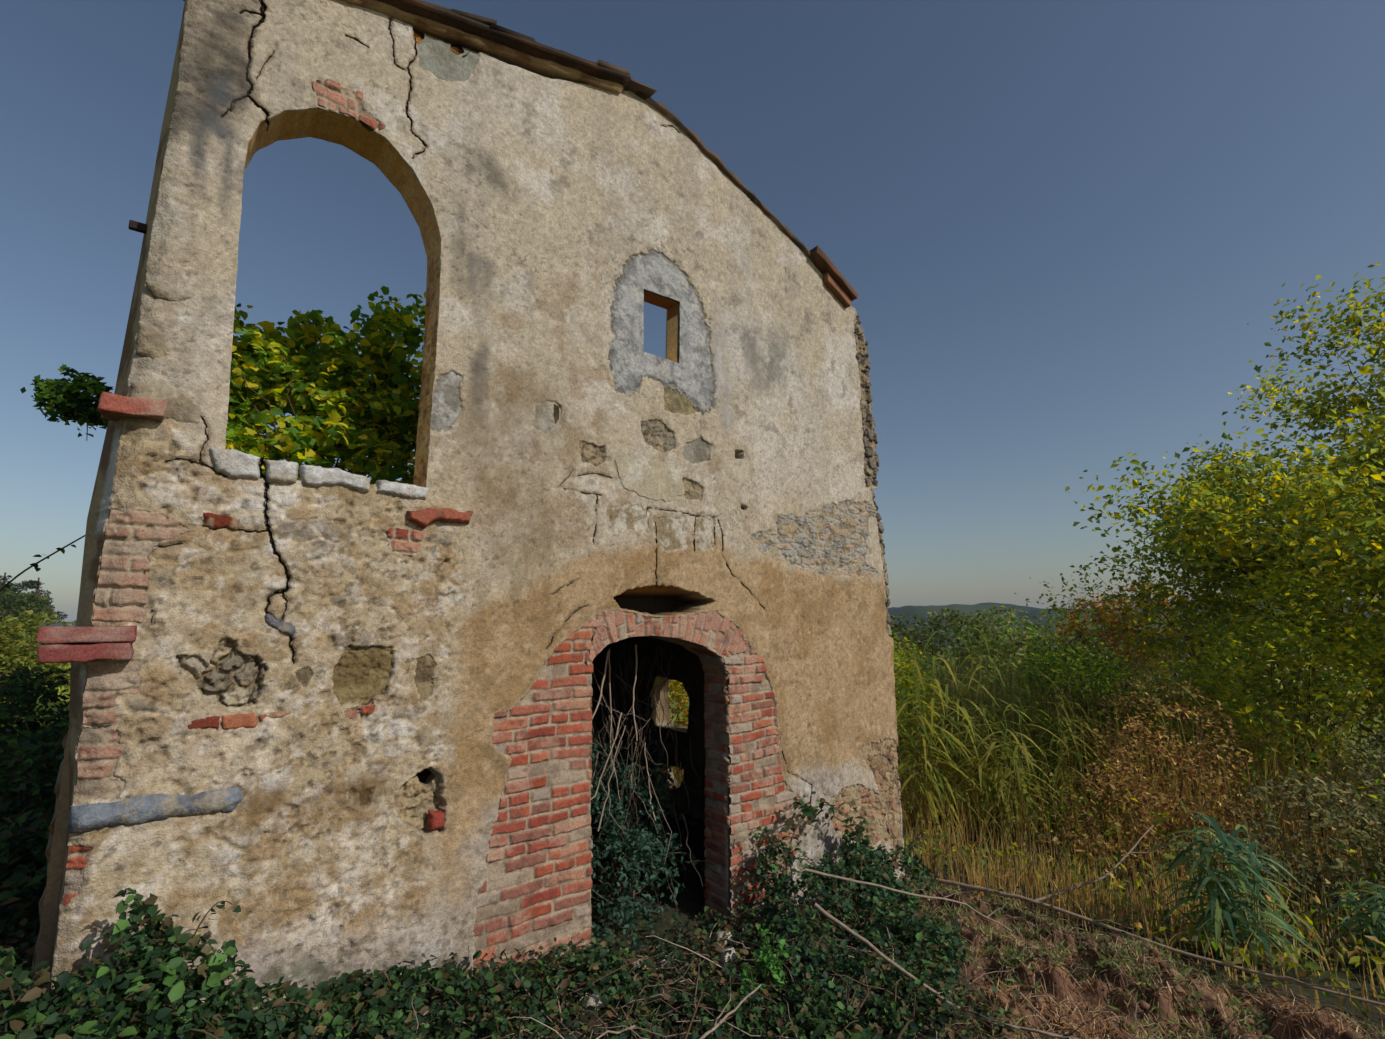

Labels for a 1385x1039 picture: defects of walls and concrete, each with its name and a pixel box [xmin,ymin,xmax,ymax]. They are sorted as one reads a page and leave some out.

crack [221,0,274,131]
peeling [313,79,386,130]
crack [345,18,427,159]
peeling [430,371,462,432]
flaking render [93,509,190,622]
crack [165,415,295,663]
spalling [180,639,266,708]
spalling [296,667,313,687]
spalling [332,646,393,719]
spalling [393,768,441,830]